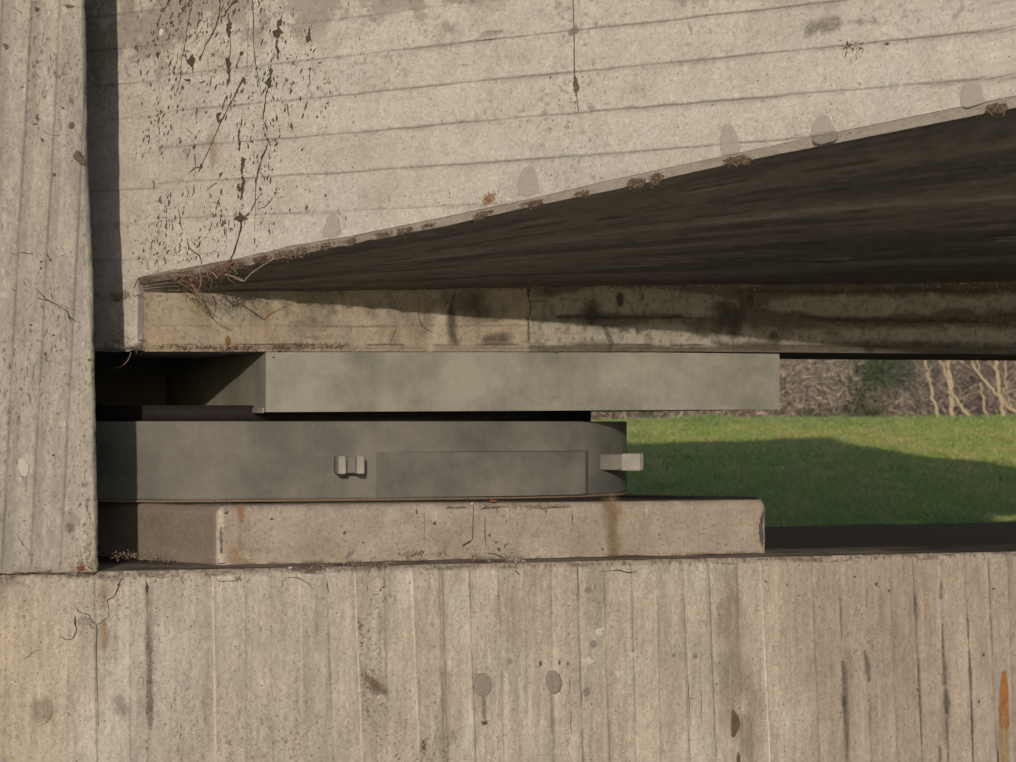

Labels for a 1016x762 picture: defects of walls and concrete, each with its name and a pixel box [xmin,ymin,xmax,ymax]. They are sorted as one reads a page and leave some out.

crack [572,2,580,112]
rust [997,671,1008,762]